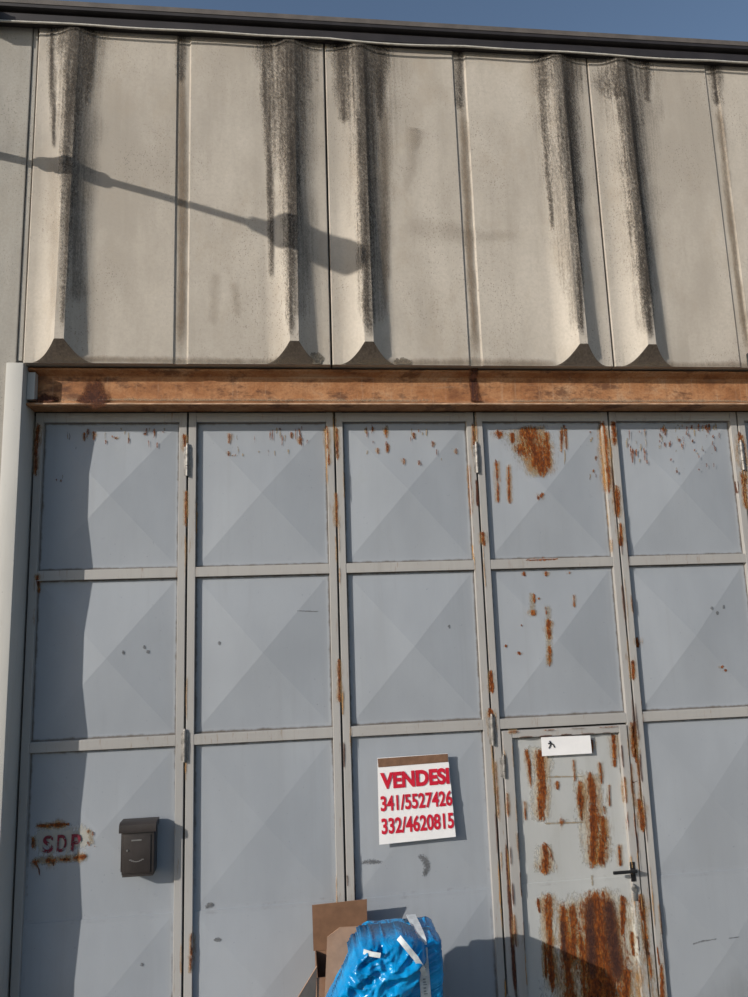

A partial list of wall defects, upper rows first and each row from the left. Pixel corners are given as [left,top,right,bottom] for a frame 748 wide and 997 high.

water stain [260,38,318,364]
water stain [330,43,396,365]
water stain [534,54,584,329]
water stain [597,57,673,366]
water stain [35,338,99,363]
rust [77,379,111,408]
rust [469,368,482,445]
rust [495,459,511,503]
rust [495,425,567,476]
water stain [555,344,605,366]
rust [589,421,648,564]
rust [491,701,665,997]